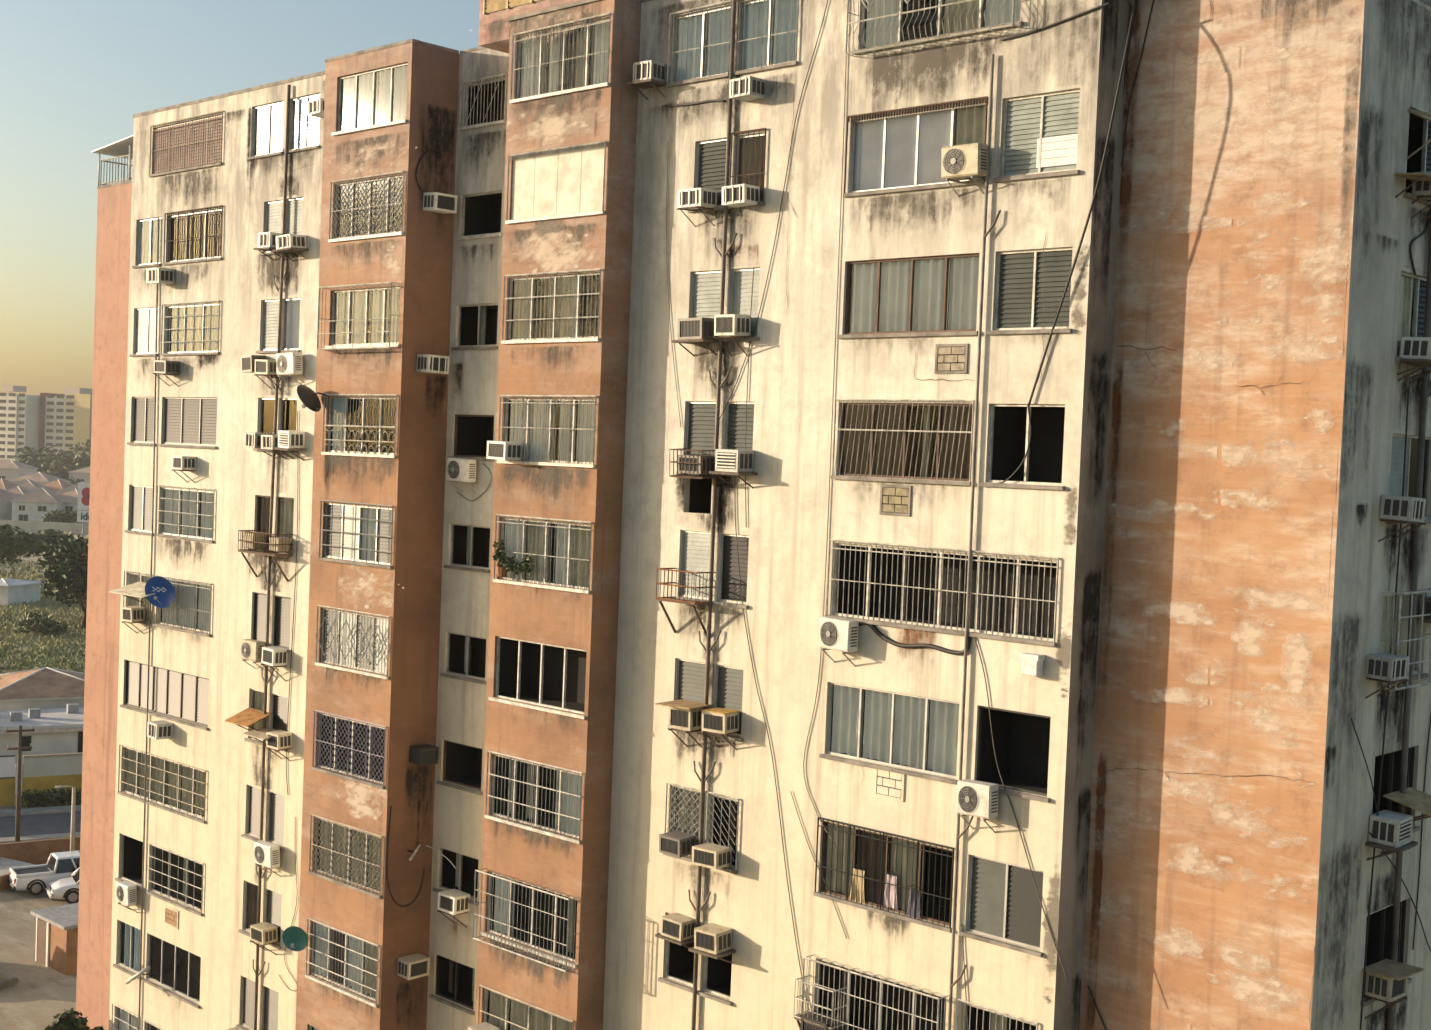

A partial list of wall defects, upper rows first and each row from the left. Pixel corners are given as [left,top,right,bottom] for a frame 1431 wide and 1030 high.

water stain [1262,0,1338,26]
water stain [866,36,1004,102]
water stain [421,106,501,194]
water stain [704,209,748,236]
water stain [698,341,739,398]
water stain [1336,367,1370,494]
peeling [1146,603,1213,625]
peeling [1232,589,1321,656]
peeling [1152,659,1218,704]
peeling [1267,633,1311,702]
crack [1100,768,1314,783]